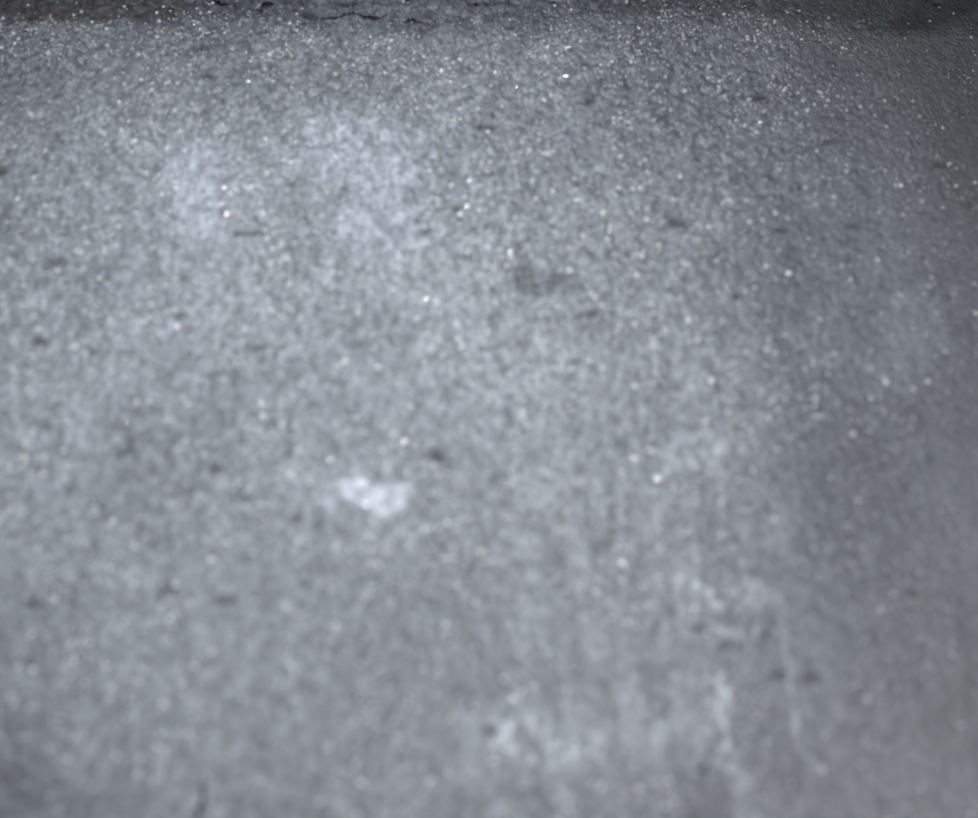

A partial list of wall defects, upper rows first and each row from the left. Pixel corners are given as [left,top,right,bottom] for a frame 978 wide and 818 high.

crack [213,0,278,13]
crack [321,0,427,24]